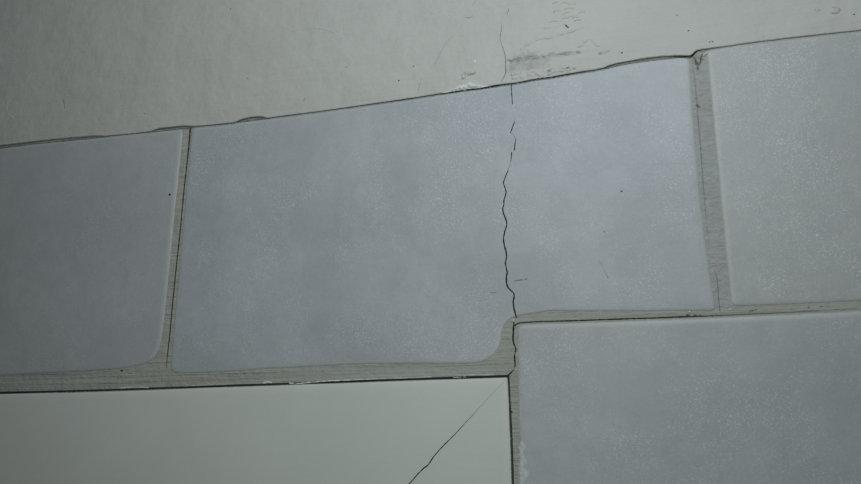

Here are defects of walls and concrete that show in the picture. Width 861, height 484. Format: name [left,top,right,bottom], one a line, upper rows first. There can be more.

crack [0,47,724,484]